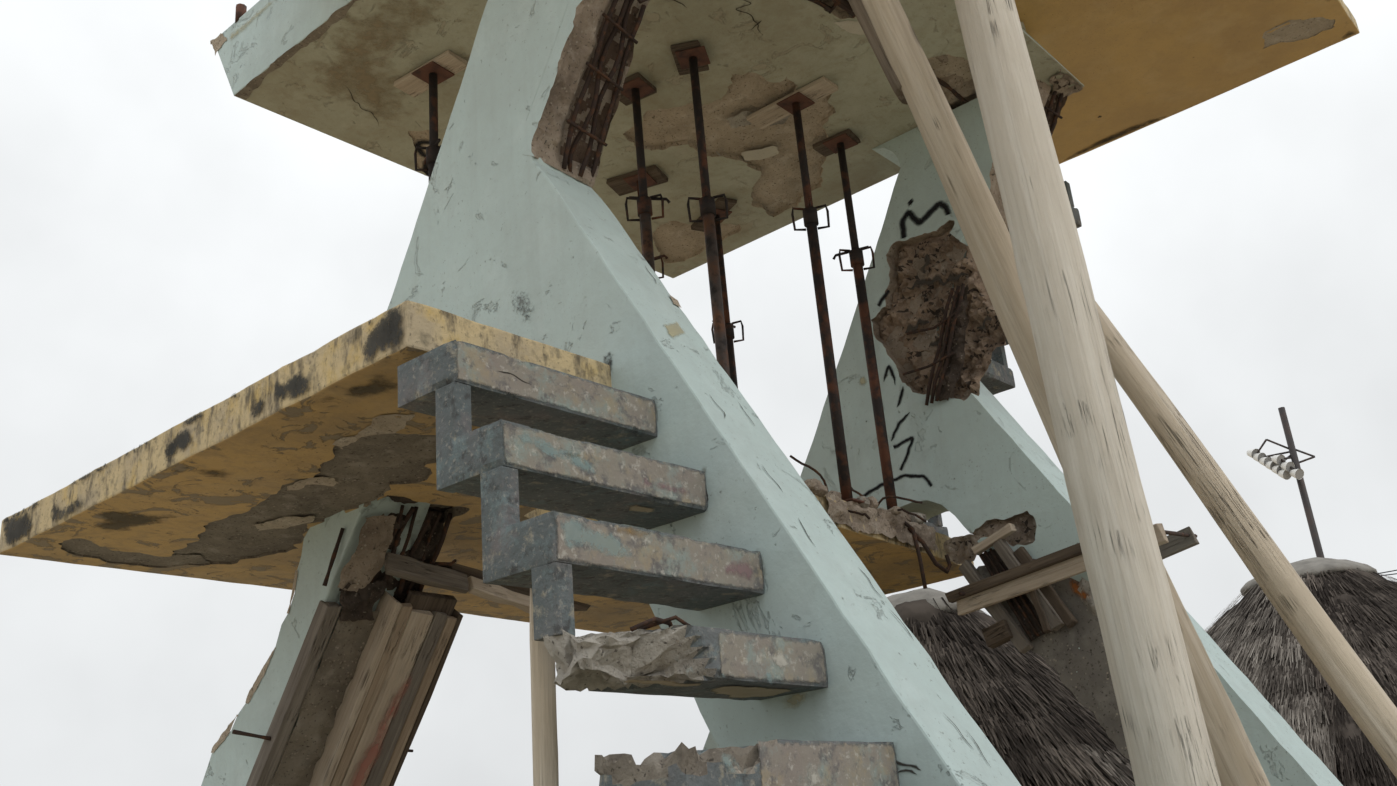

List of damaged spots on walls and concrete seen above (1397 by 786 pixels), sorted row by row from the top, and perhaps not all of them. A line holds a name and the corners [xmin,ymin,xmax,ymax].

spalling [808,0,856,18]
peeling [1263,17,1335,48]
spalling [521,0,835,213]
spalling [1036,69,1083,136]
spalling [980,142,1009,231]
spalling [877,228,1007,406]
water stain [164,429,191,462]
water stain [97,513,168,530]
spalling [790,455,1036,589]